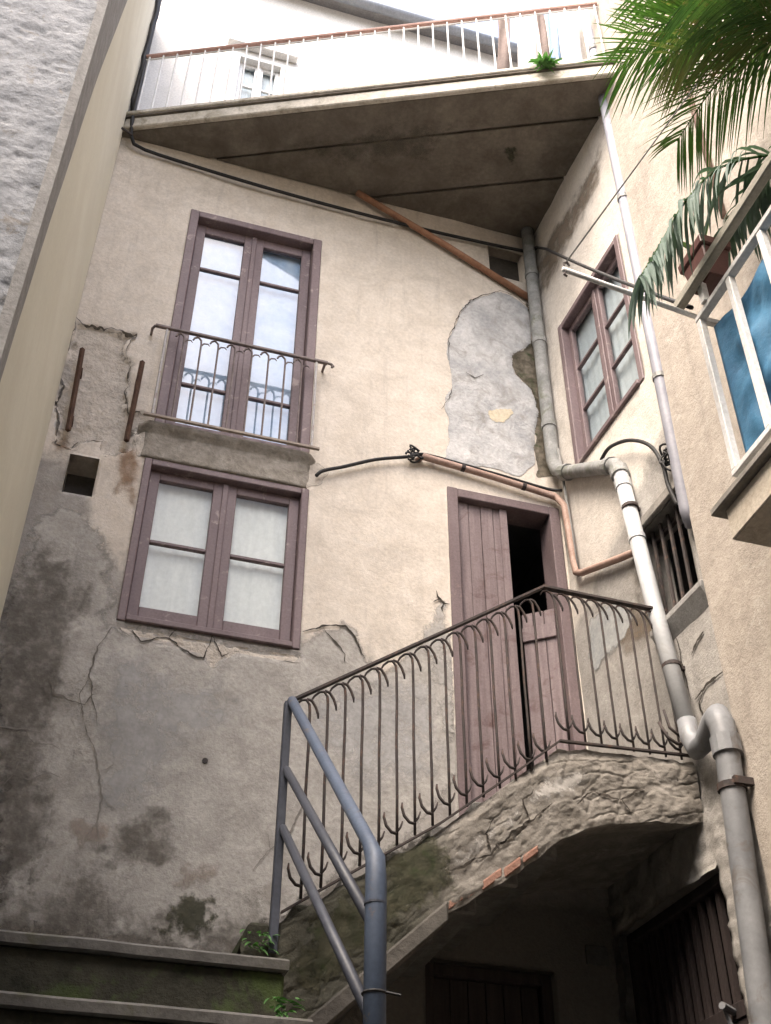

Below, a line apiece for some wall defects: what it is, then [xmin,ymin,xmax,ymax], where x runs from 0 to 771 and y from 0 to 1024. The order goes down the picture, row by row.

spalling [52,317,148,457]
peeling [488,409,513,423]
rust [121,451,137,490]
spalling [306,464,328,487]
damp [0,554,68,873]
crack [43,628,227,847]
flaking render [0,507,456,949]
crack [676,631,723,716]
damp [9,878,175,947]